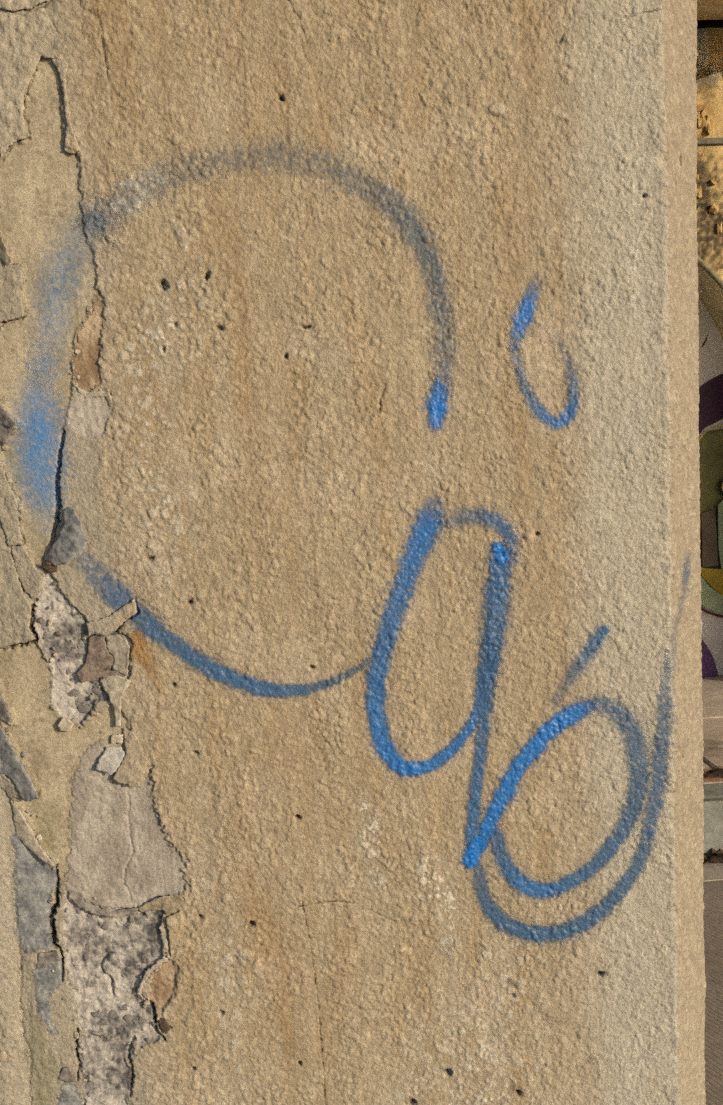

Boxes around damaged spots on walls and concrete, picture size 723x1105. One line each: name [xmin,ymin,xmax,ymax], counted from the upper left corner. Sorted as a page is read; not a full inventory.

peeling [0,57,189,1105]